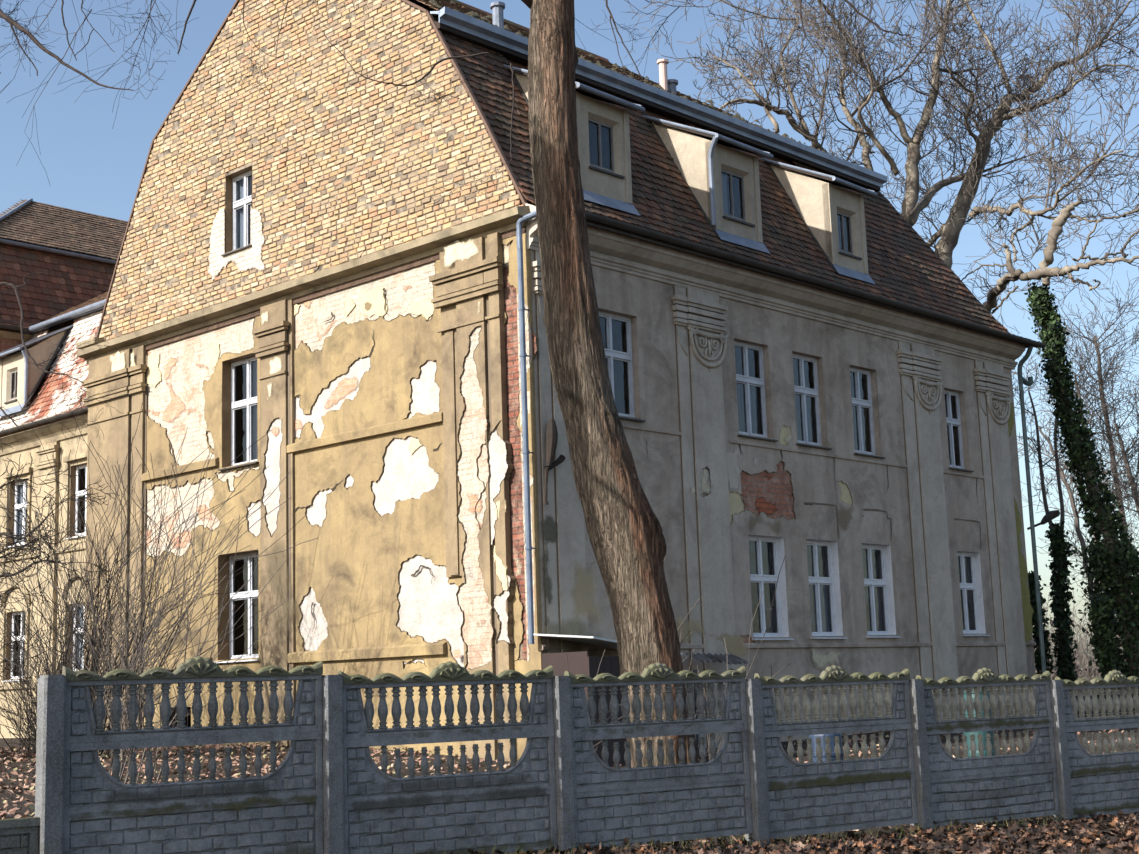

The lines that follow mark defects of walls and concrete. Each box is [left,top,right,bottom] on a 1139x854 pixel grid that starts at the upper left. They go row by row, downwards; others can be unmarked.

flaking render [0,338,22,358]
flaking render [110,312,268,466]
flaking render [146,240,478,557]
flaking render [395,240,539,670]
flaking render [729,461,796,525]
flaking render [298,586,328,651]